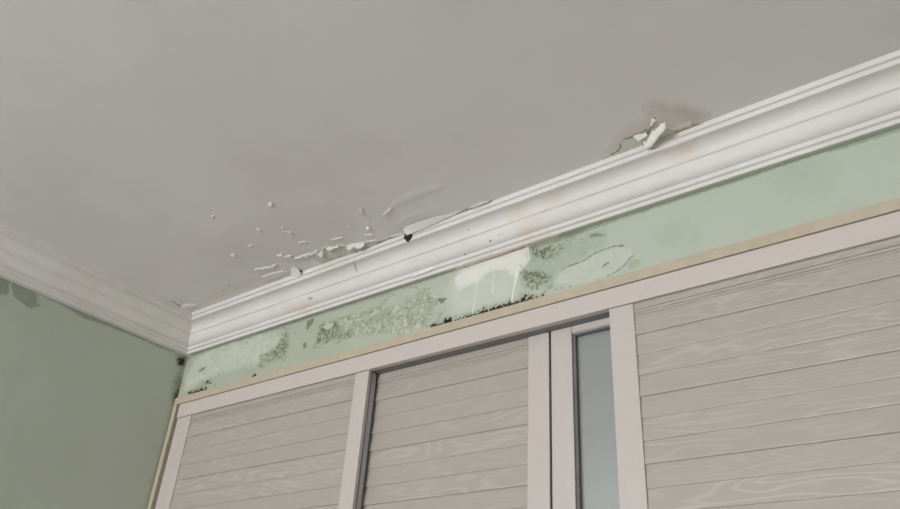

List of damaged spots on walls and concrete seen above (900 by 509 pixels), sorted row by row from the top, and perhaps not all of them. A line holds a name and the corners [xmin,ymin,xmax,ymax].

peeling [606,117,702,158]
peeling [314,200,492,264]
damp [430,188,608,328]
spalling [303,267,447,350]
peeling [182,327,295,393]